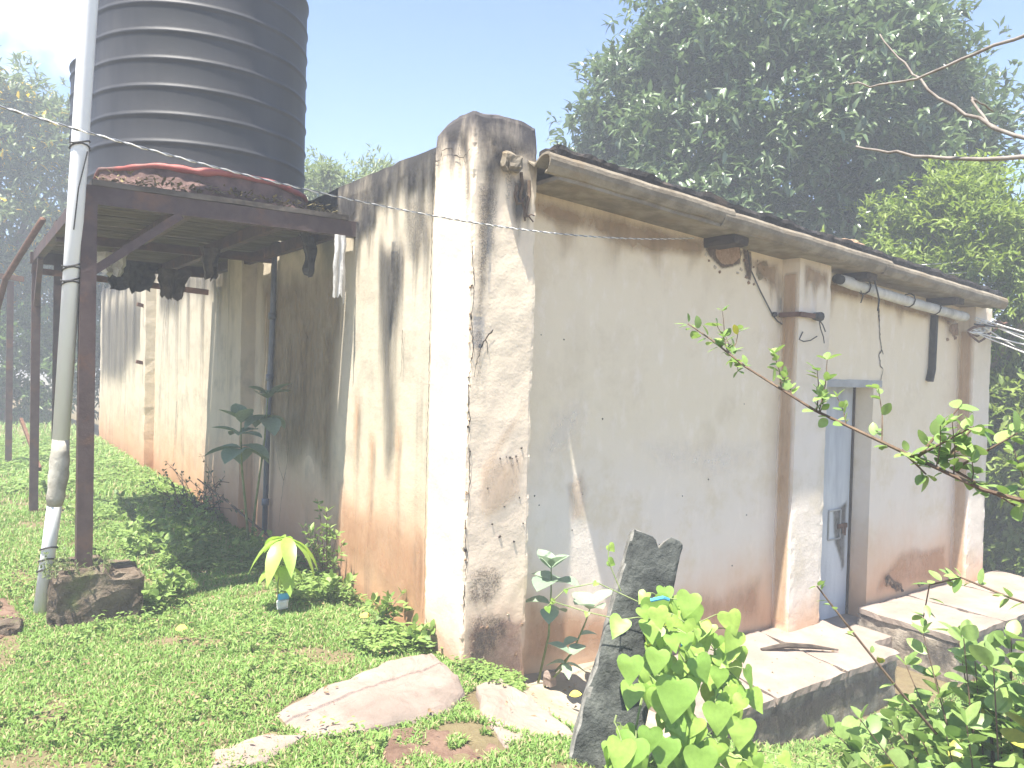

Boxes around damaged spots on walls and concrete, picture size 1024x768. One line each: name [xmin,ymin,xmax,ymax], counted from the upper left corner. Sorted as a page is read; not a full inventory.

leakage [481,135,527,214]
leakage [316,147,439,451]
crack [474,330,493,377]
leakage [471,570,501,599]
leakage [473,617,506,659]